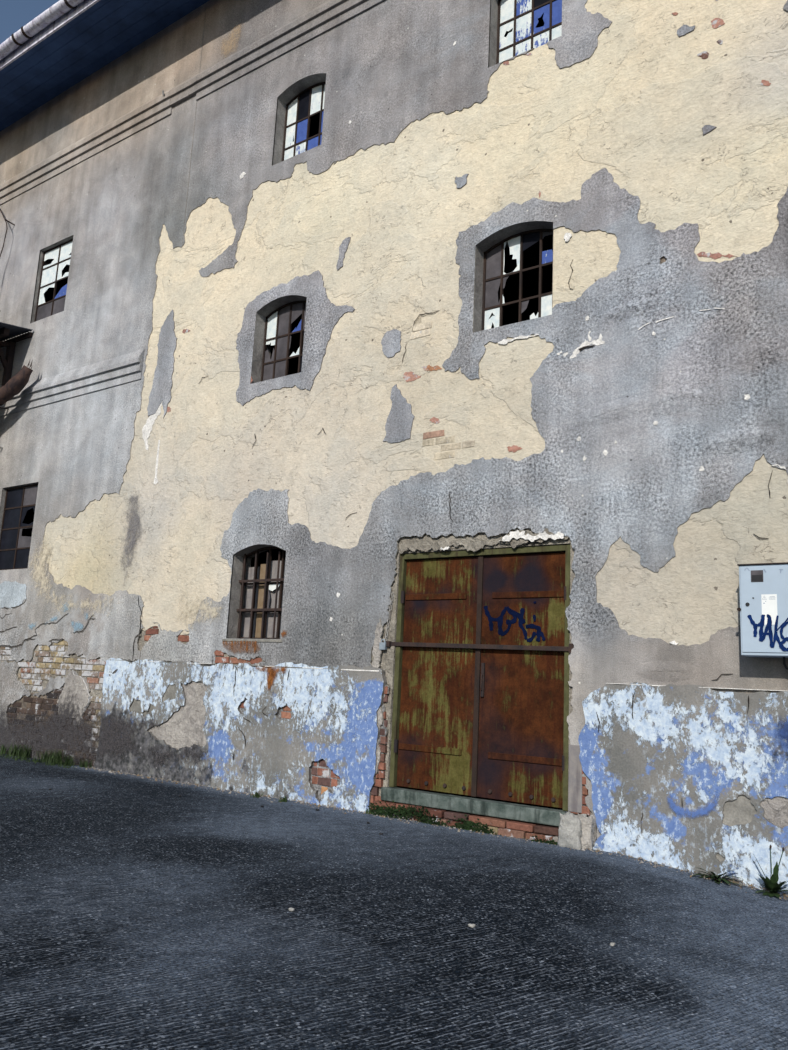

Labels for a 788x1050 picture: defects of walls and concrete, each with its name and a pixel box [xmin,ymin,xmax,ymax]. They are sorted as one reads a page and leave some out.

peeling [0,0,788,651]
crack [0,600,95,648]
flaking render [0,640,106,767]
flaking render [130,681,207,750]
flaking render [370,528,575,810]
flaking render [311,760,340,794]
flaking render [568,740,592,817]
flaking render [723,794,788,828]